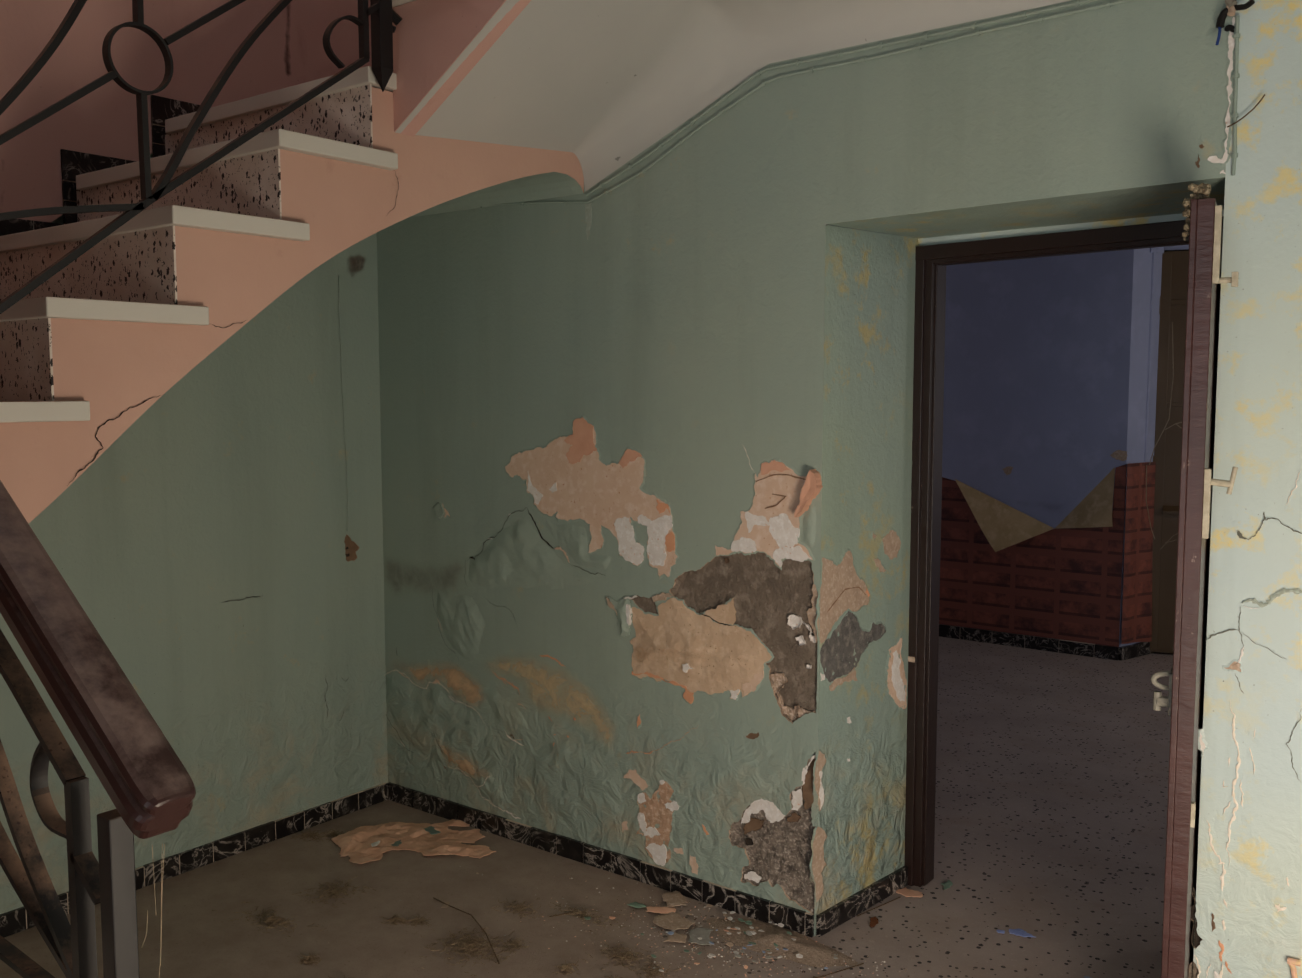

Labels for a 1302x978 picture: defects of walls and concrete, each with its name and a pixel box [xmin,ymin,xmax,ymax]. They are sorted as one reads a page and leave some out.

crack [73,396,159,480]
crack [464,510,605,625]
peeling [505,415,907,724]
peeling [620,768,698,875]
flaking render [728,749,827,915]
crack [1194,588,1302,978]